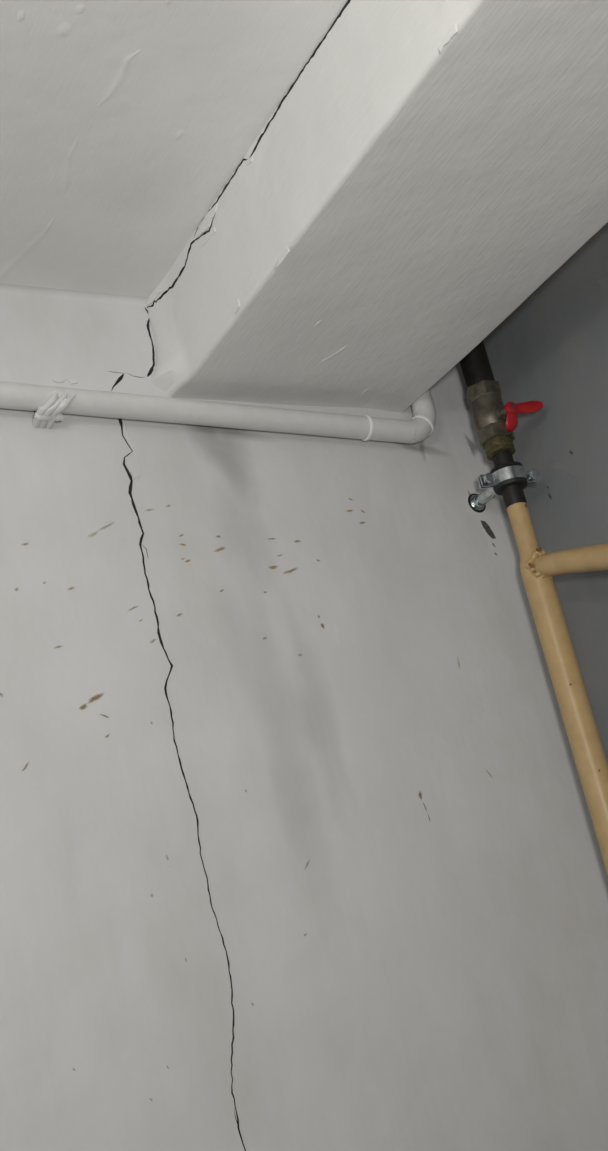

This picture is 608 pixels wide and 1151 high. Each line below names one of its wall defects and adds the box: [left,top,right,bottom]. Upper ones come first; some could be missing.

crack [108,0,351,391]
crack [118,418,246,1151]